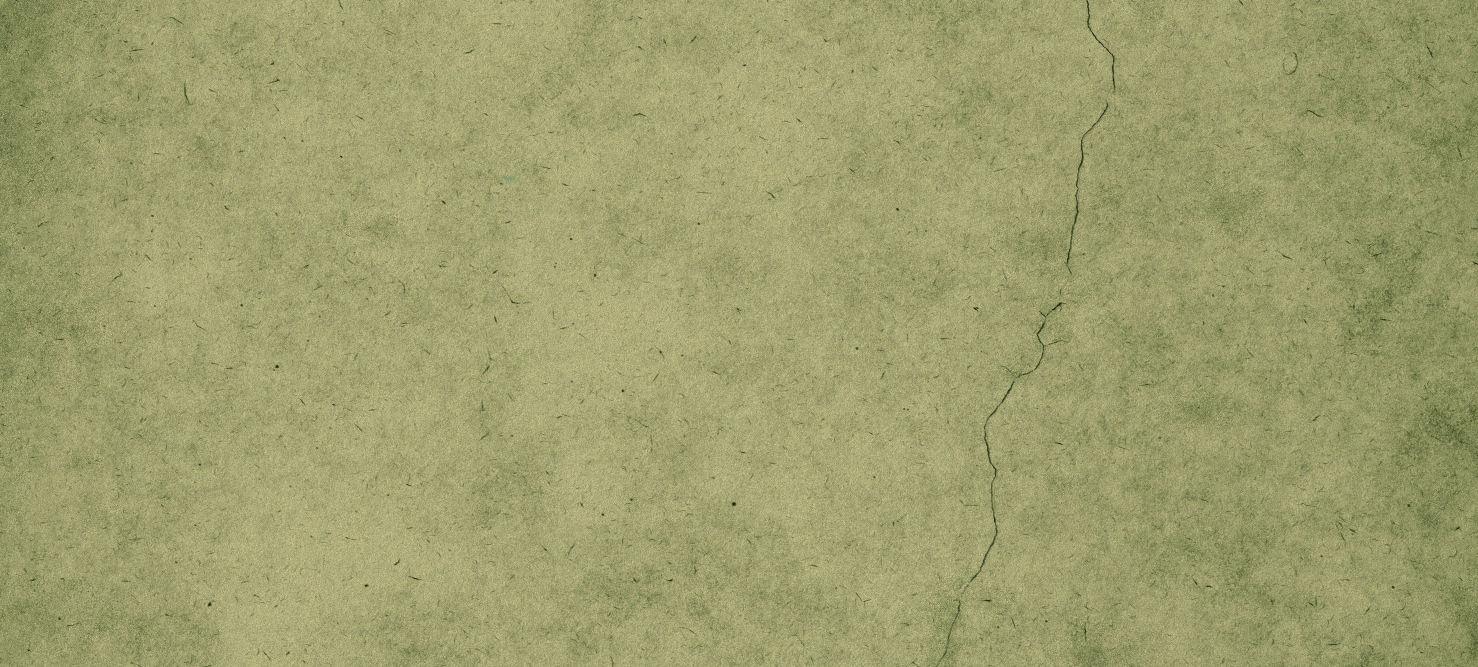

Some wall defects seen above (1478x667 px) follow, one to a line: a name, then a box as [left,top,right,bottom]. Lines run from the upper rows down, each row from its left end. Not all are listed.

crack [943,0,1115,656]